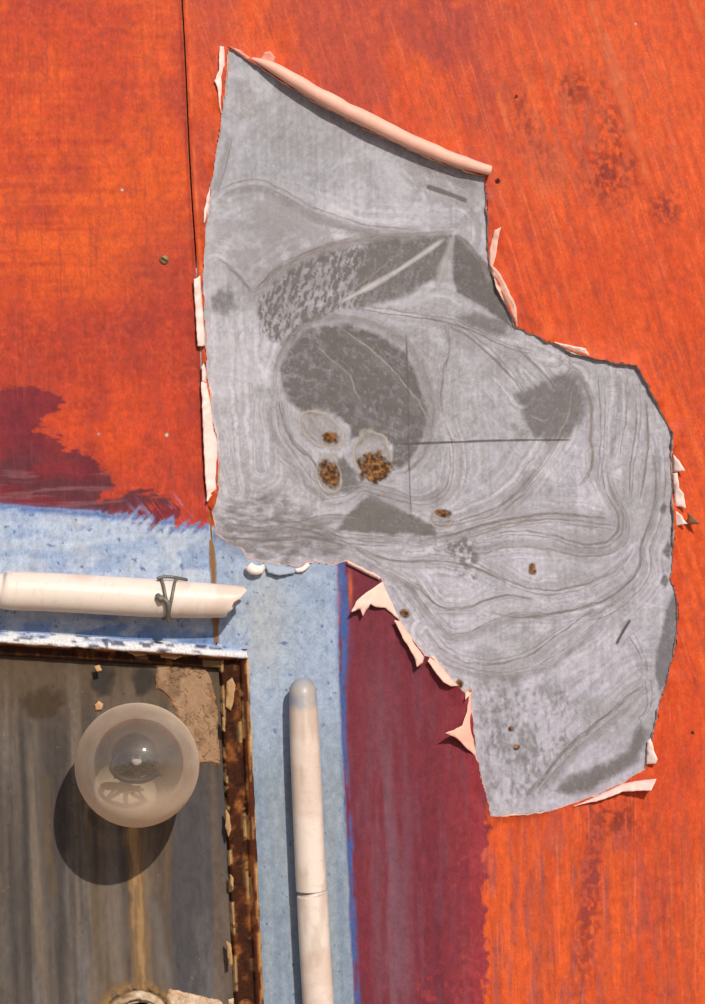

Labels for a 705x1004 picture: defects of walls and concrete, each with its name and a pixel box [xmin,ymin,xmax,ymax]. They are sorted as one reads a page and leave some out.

corrosion [298,408,393,494]
peeling [194,46,701,817]
corrosion [429,509,453,529]
peeling [156,654,236,765]
peeling [167,989,234,1004]